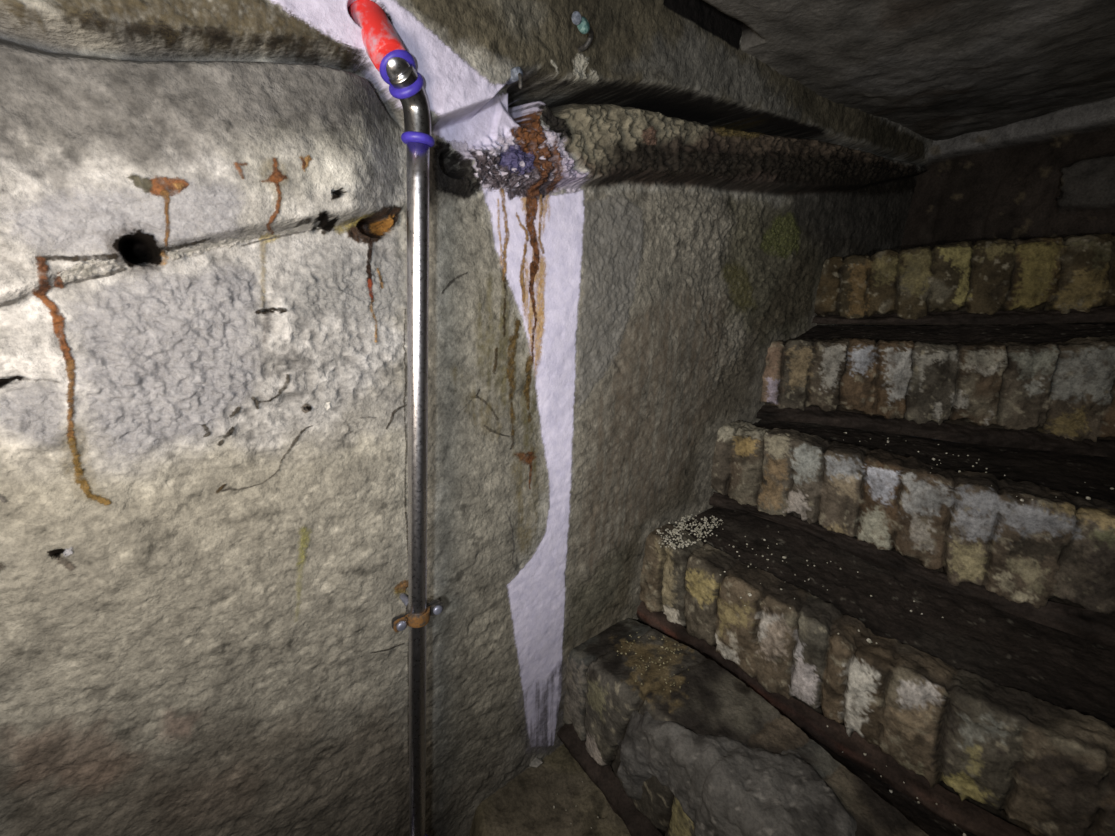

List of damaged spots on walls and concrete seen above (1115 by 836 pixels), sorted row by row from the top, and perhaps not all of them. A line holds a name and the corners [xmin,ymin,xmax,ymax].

crack [0,254,125,307]
corrosion [128,175,189,247]
crack [160,238,210,252]
corrosion [261,158,287,235]
crack [241,228,335,246]
corrosion [469,112,586,370]
corrosion [32,257,111,505]
corrosion [515,452,535,489]